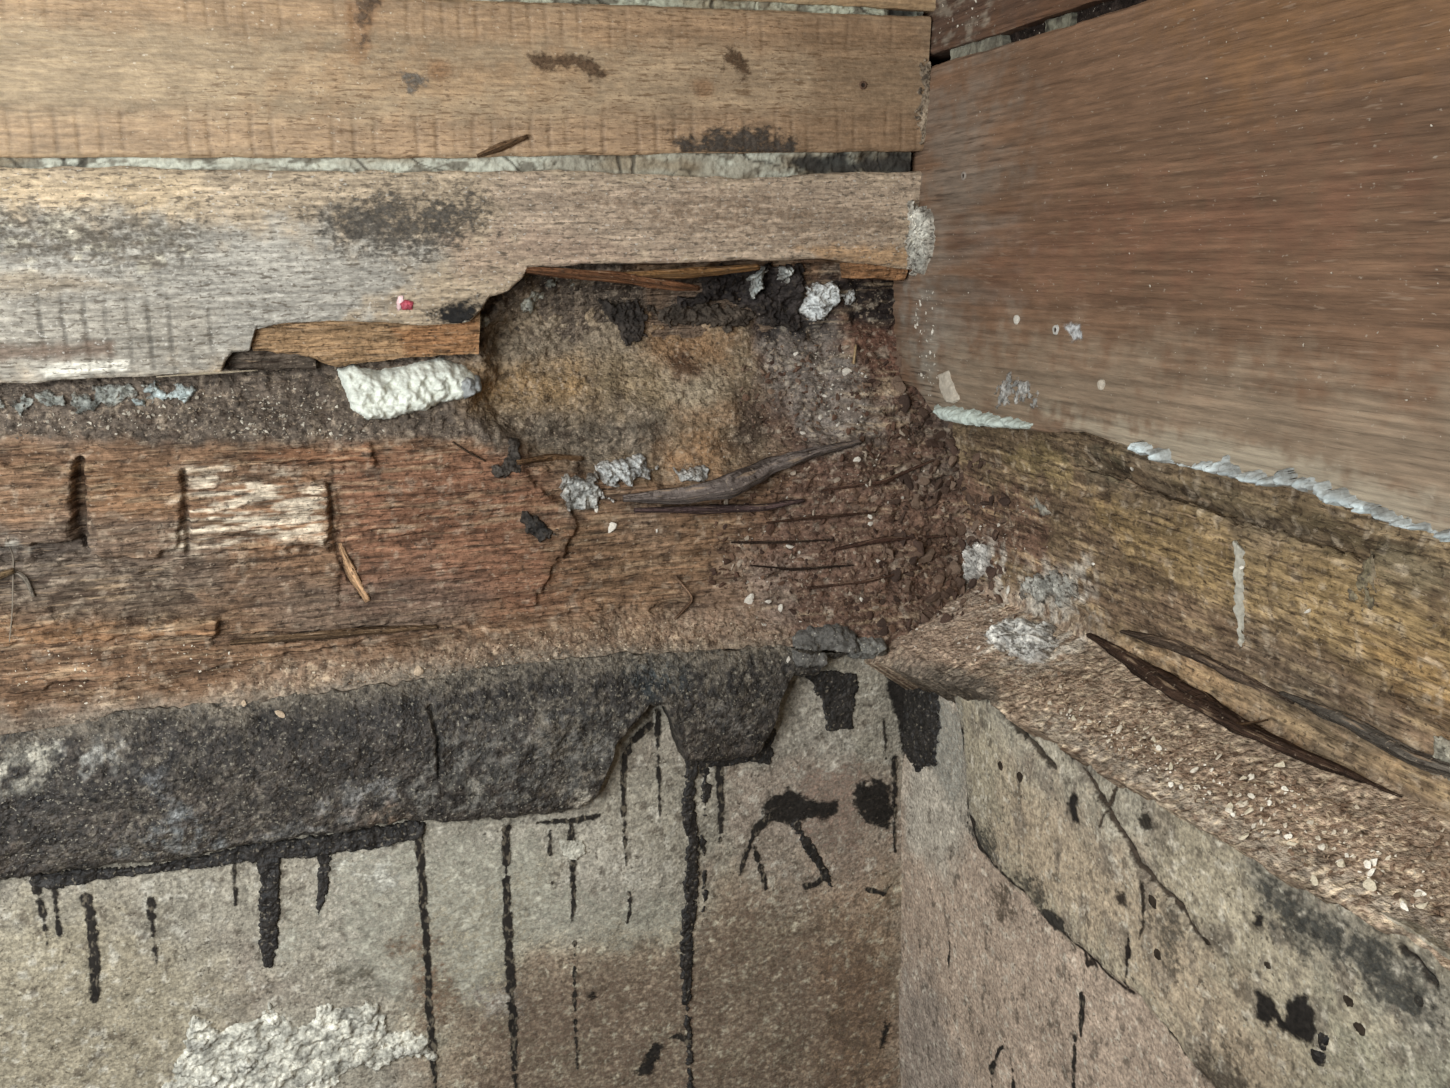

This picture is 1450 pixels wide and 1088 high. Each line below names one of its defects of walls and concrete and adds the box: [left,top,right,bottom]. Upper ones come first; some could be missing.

damp [298,181,500,262]
spalling [840,263,908,281]
damp [797,760,869,869]
crack [969,812,1025,893]
crack [1005,717,1203,994]
damp [277,824,899,1088]